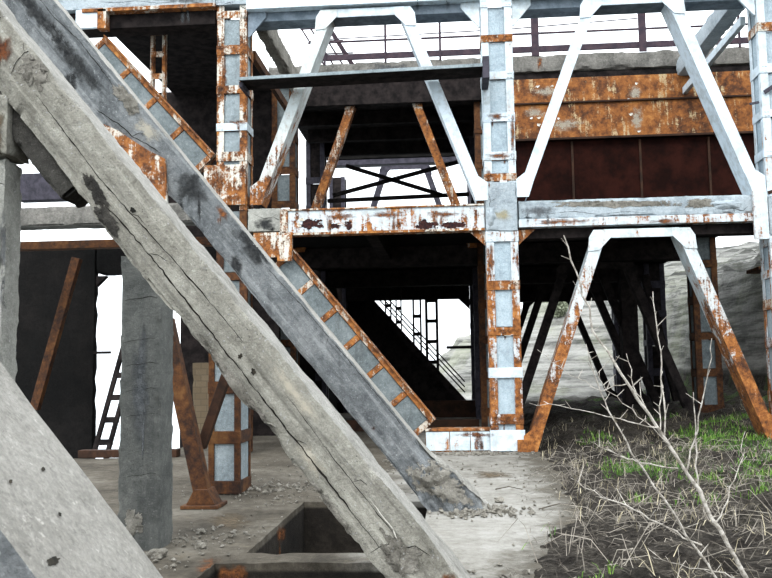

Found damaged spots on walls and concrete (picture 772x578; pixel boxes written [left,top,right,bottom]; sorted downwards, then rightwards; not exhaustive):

corrosion [0,39,10,60]
corrosion [213,172,241,201]
corrosion [376,212,402,230]
crack [37,96,430,560]
spalling [405,459,474,507]